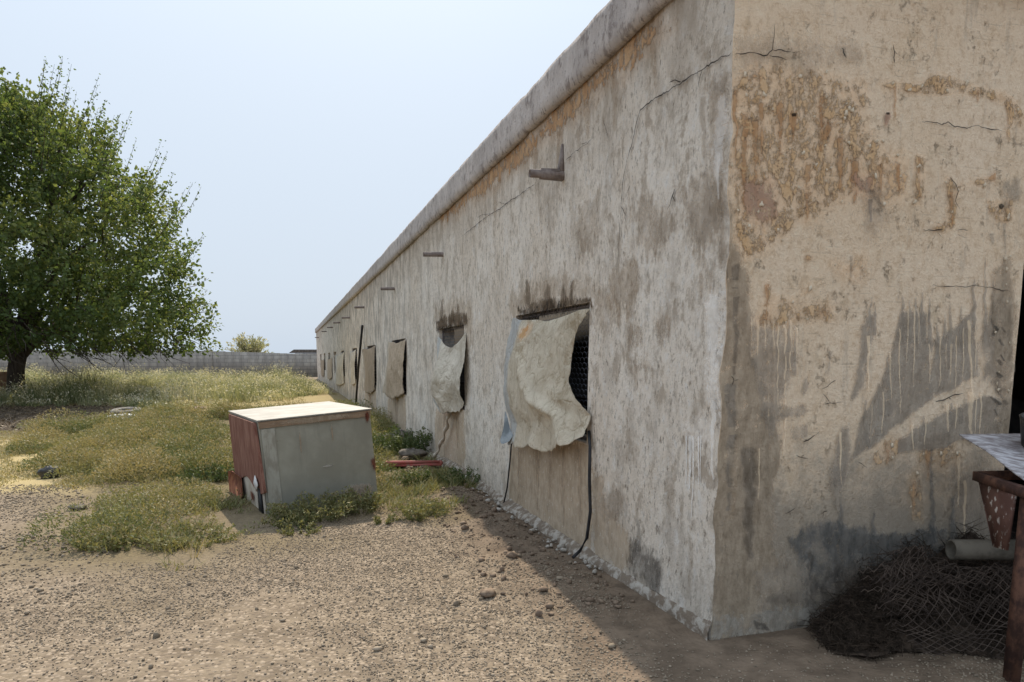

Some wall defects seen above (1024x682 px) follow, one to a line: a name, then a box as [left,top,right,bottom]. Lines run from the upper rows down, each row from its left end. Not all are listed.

crack [567,25,797,278]
peeling [728,63,901,255]
peeling [884,75,1023,140]
crack [926,121,1001,147]
peeling [936,178,962,232]
water stain [543,285,573,308]
water stain [685,175,1011,639]